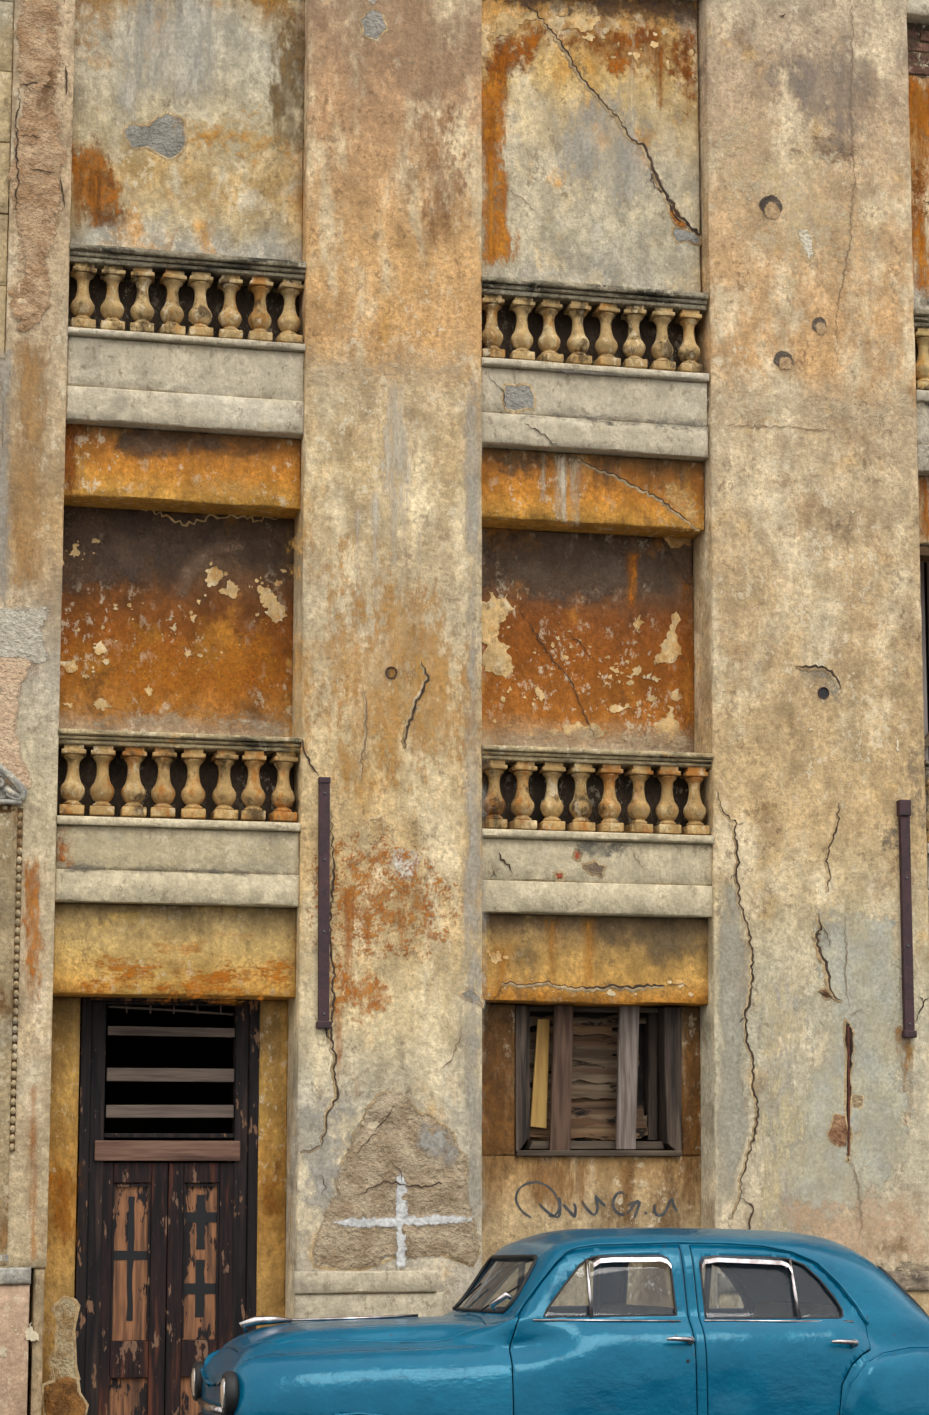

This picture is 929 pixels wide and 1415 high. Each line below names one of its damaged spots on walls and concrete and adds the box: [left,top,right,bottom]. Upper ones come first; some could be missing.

spalling [7,0,67,332]
corrosion [483,24,696,98]
crack [524,1,700,237]
corrosion [908,75,929,291]
spalling [0,606,136,792]
peeling [162,562,288,662]
peeling [482,592,545,707]
peeling [533,612,683,743]
crack [300,810,461,1195]
corrosion [307,828,464,1020]
crack [715,792,760,1230]
crack [812,803,863,1015]